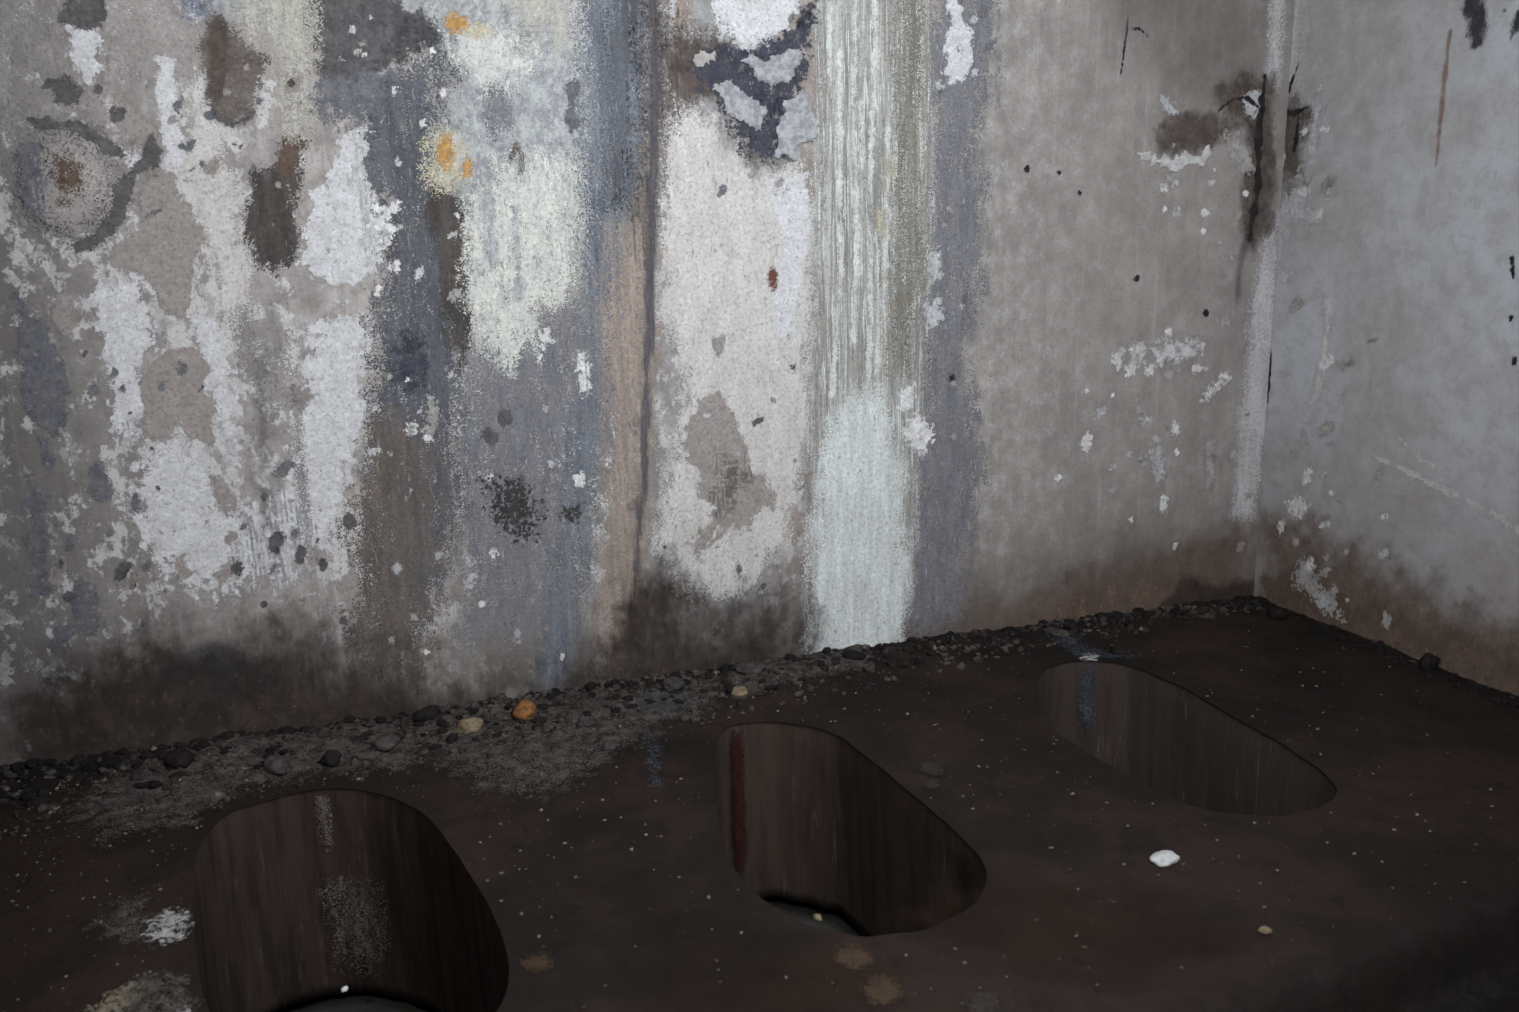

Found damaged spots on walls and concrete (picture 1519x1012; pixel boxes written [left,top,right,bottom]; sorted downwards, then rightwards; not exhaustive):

peeling [446,288,465,304]
peeling [10,0,425,660]
peeling [403,394,442,443]
peeling [572,470,586,489]
peeling [463,573,486,608]
peeling [411,613,440,655]